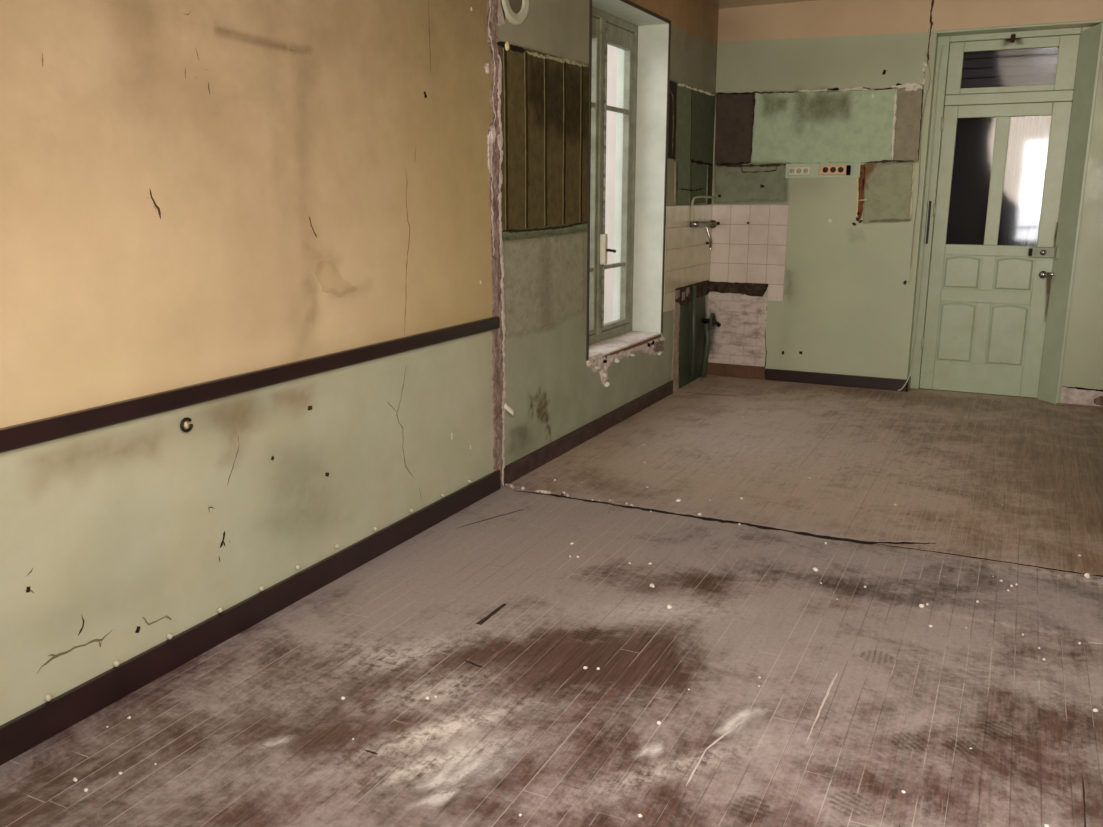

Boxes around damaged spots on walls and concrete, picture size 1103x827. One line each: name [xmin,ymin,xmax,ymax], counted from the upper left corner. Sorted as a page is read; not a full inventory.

peeling [484,54,503,173]
flaking render [586,280,768,392]
crack [388,365,422,499]
crack [37,616,113,673]